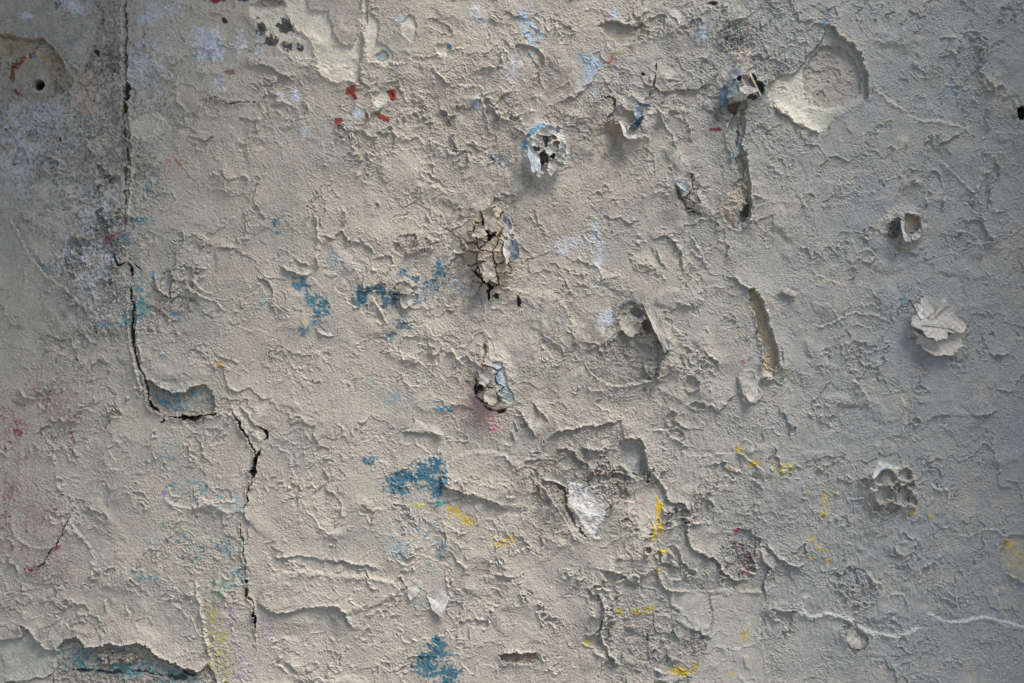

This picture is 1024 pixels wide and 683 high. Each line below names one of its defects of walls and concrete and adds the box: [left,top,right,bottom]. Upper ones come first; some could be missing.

spalling [0,0,105,116]
spalling [768,6,887,136]
spalling [716,116,764,236]
crack [109,0,269,628]
spalling [725,263,799,384]
spalling [144,367,216,430]
spalling [519,293,831,683]
crack [8,514,84,585]
spalling [0,583,217,683]